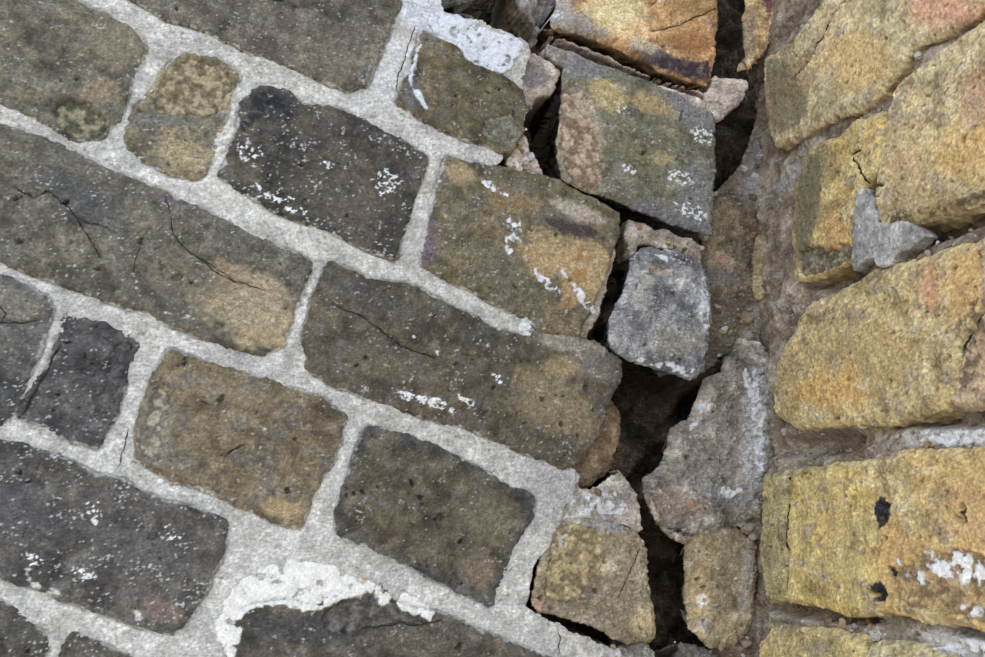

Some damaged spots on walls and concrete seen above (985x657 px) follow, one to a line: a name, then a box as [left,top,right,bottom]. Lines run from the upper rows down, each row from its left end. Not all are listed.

crack [450,11,475,19]
crack [653,0,757,193]
crack [524,98,550,156]
crack [16,187,115,259]
crack [165,197,262,290]
crack [691,235,701,246]
crack [334,305,435,359]
crack [587,269,626,339]
crack [526,355,724,657]
leakage [895,550,985,586]
spalling [323,596,435,635]
leakage [960,604,984,617]